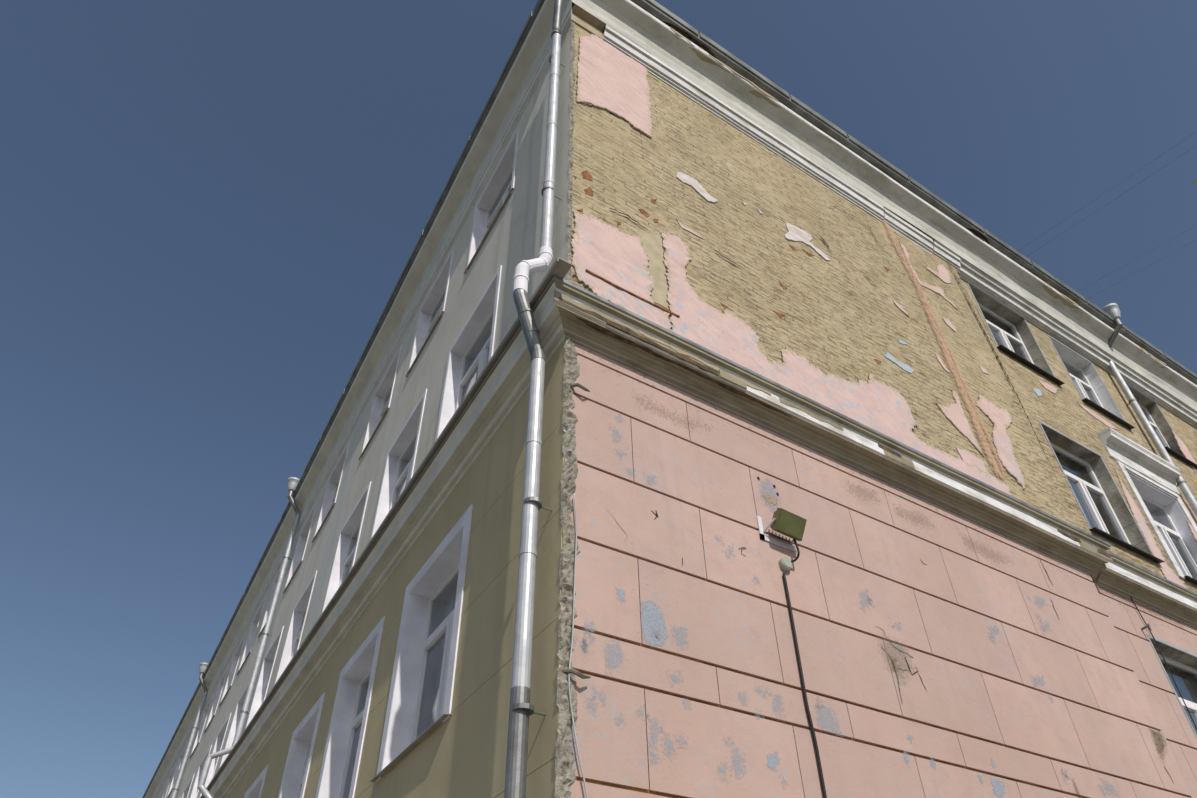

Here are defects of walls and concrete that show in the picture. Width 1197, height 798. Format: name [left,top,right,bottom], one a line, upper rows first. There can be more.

spalling [554,21,1197,593]
spalling [554,338,604,798]
peeling [640,601,687,646]
crack [877,626,928,700]